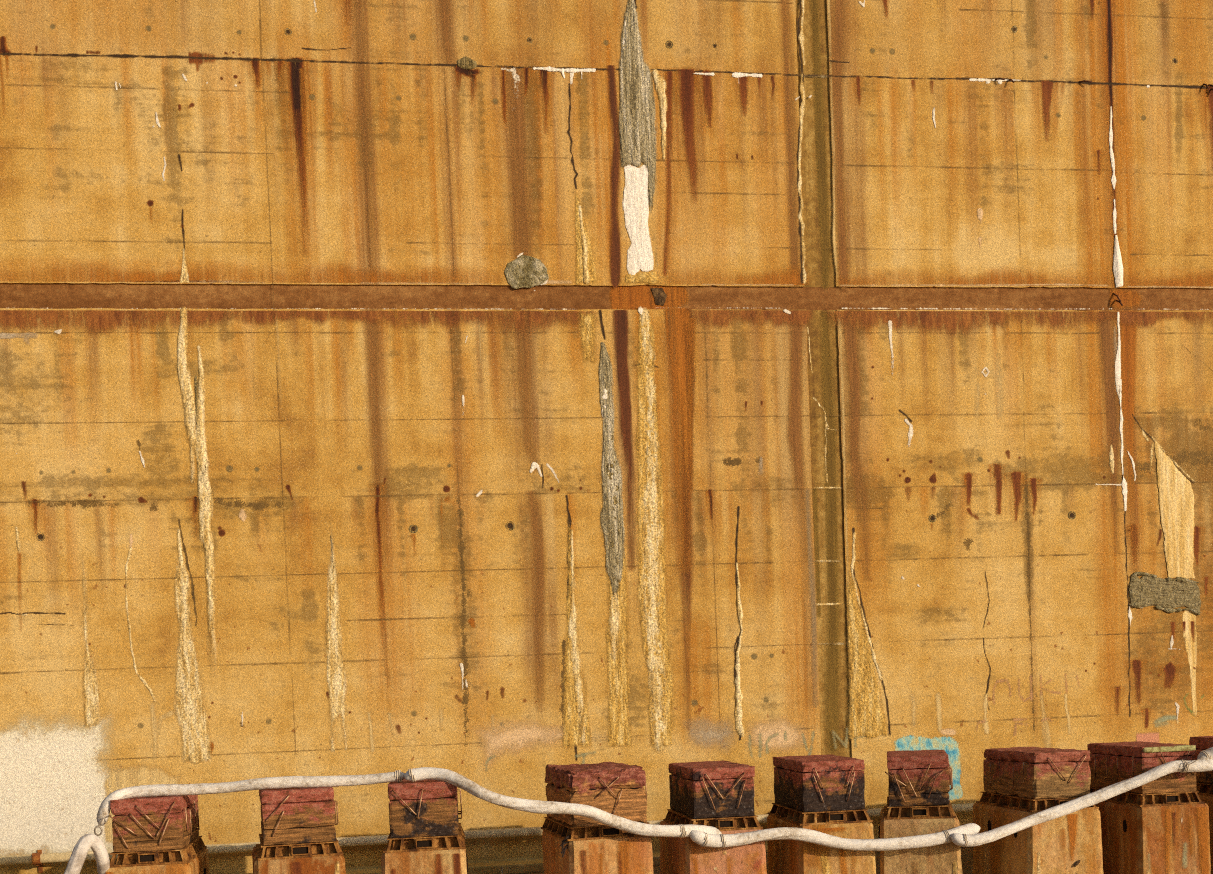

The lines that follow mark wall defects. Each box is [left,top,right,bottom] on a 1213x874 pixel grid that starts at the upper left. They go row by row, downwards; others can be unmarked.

corrosion [524,68,550,126]
corrosion [608,65,812,621]
crack [807,327,835,482]
corrosion [964,473,979,519]
corrosion [988,450,1039,520]
crack [734,506,745,740]